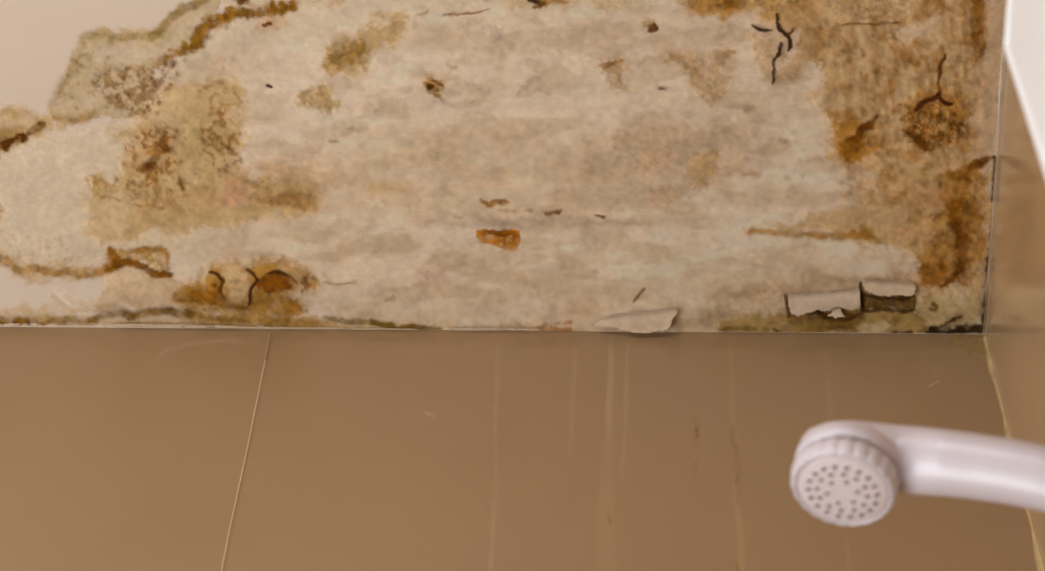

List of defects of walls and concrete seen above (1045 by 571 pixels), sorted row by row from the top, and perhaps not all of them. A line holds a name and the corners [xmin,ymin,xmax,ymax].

damp [51,0,317,242]
peeling [0,0,989,334]
crack [752,13,794,84]
damp [730,0,1007,353]
crack [915,54,953,111]
peeling [957,0,1004,206]
damp [0,306,442,330]
damp [700,288,873,333]